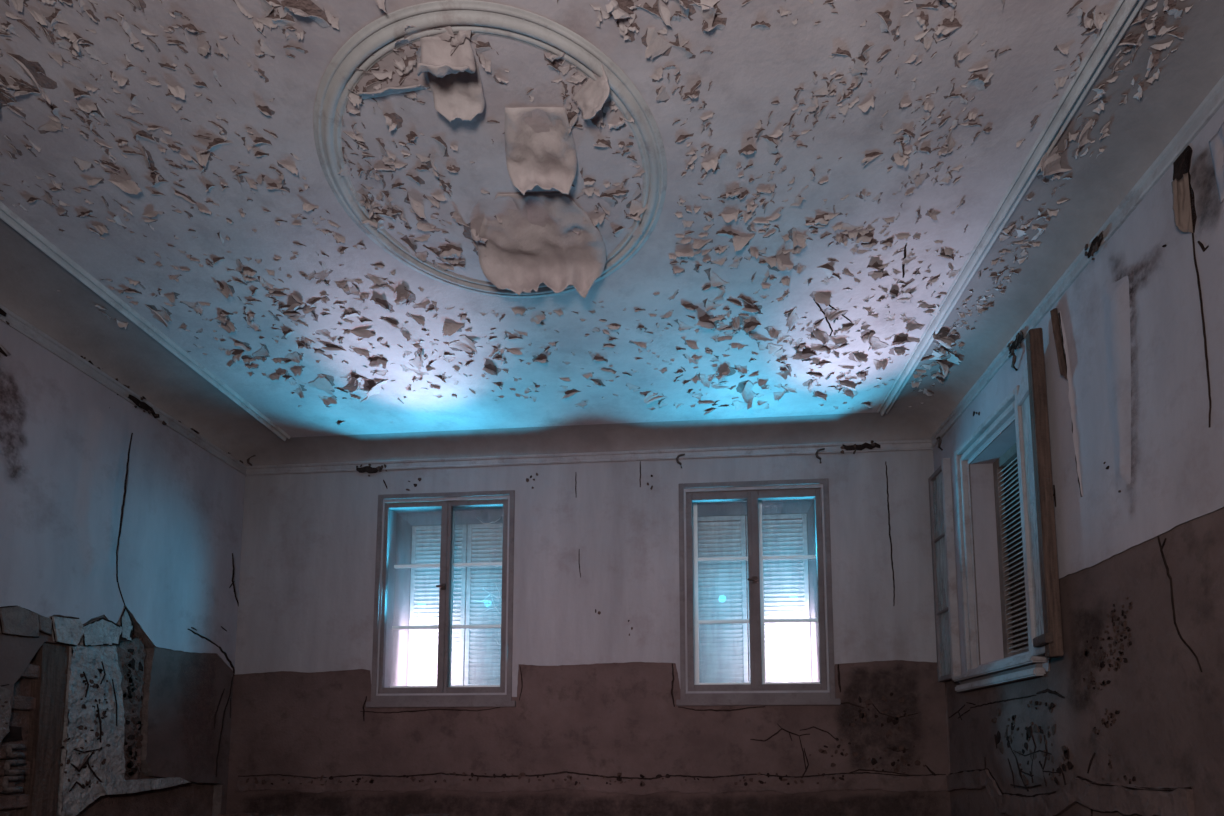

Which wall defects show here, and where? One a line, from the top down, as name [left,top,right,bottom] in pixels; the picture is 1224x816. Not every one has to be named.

peeling [0,0,1200,415]
spalling [1209,122,1224,203]
crack [1192,233,1211,428]
crack [1157,536,1203,672]
spalling [2,723,23,742]
flaking render [57,645,189,816]